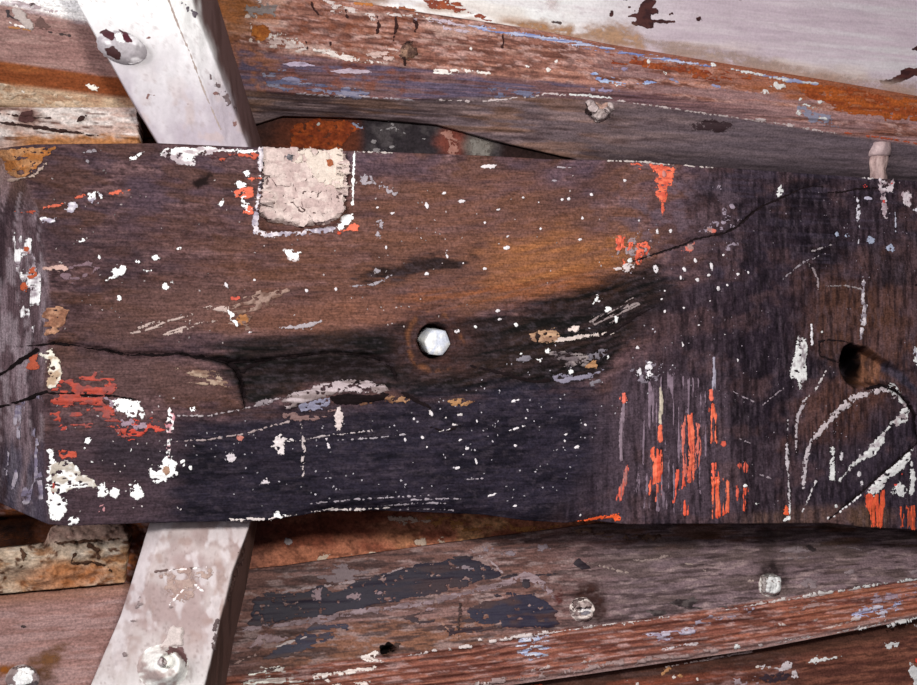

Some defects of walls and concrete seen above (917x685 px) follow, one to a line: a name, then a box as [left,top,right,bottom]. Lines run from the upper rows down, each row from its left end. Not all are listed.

spalling [628,0,675,29]
corrosion [290,118,364,150]
corrosion [610,54,753,82]
corrosion [797,81,917,121]
peeling [161,123,405,238]
crack [633,185,877,262]
crack [591,307,654,341]
crack [0,341,464,432]
crack [470,365,551,383]
peeling [6,349,192,525]
peeling [616,356,757,519]
peeling [234,546,917,685]